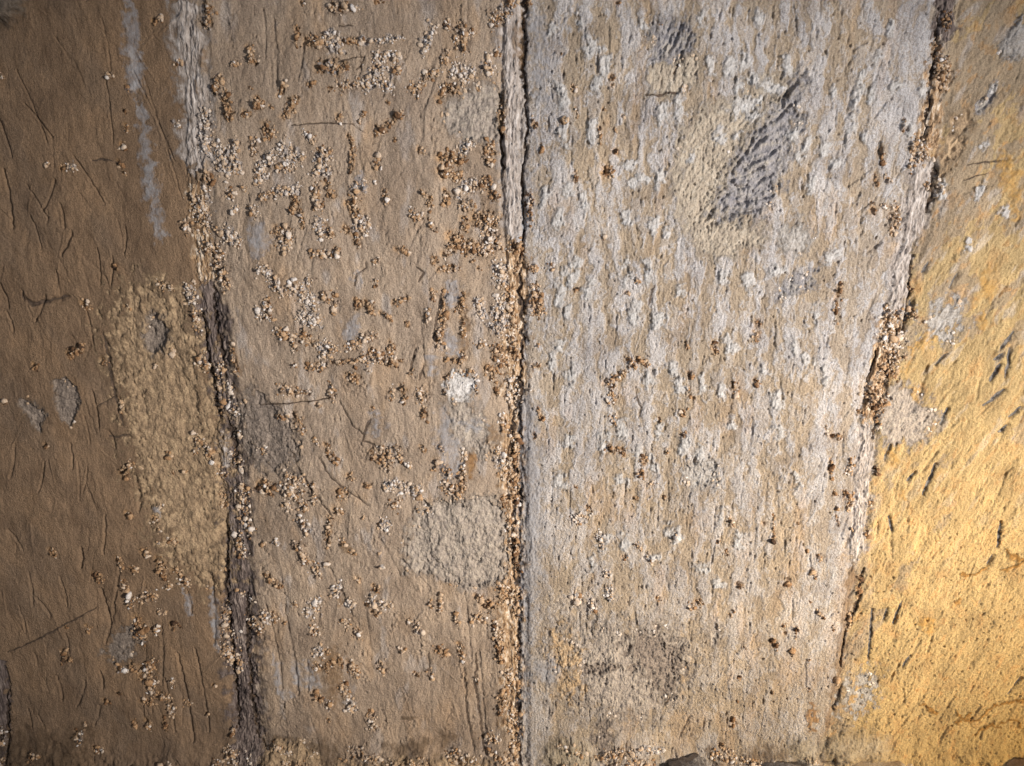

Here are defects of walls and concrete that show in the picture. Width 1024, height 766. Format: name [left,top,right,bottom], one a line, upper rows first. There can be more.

water stain [43,160,78,173]
water stain [117,109,129,176]
crack [166,0,382,766]
crack [464,0,555,766]
crack [831,0,1015,709]
water stain [568,568,615,614]
crack [819,739,850,764]